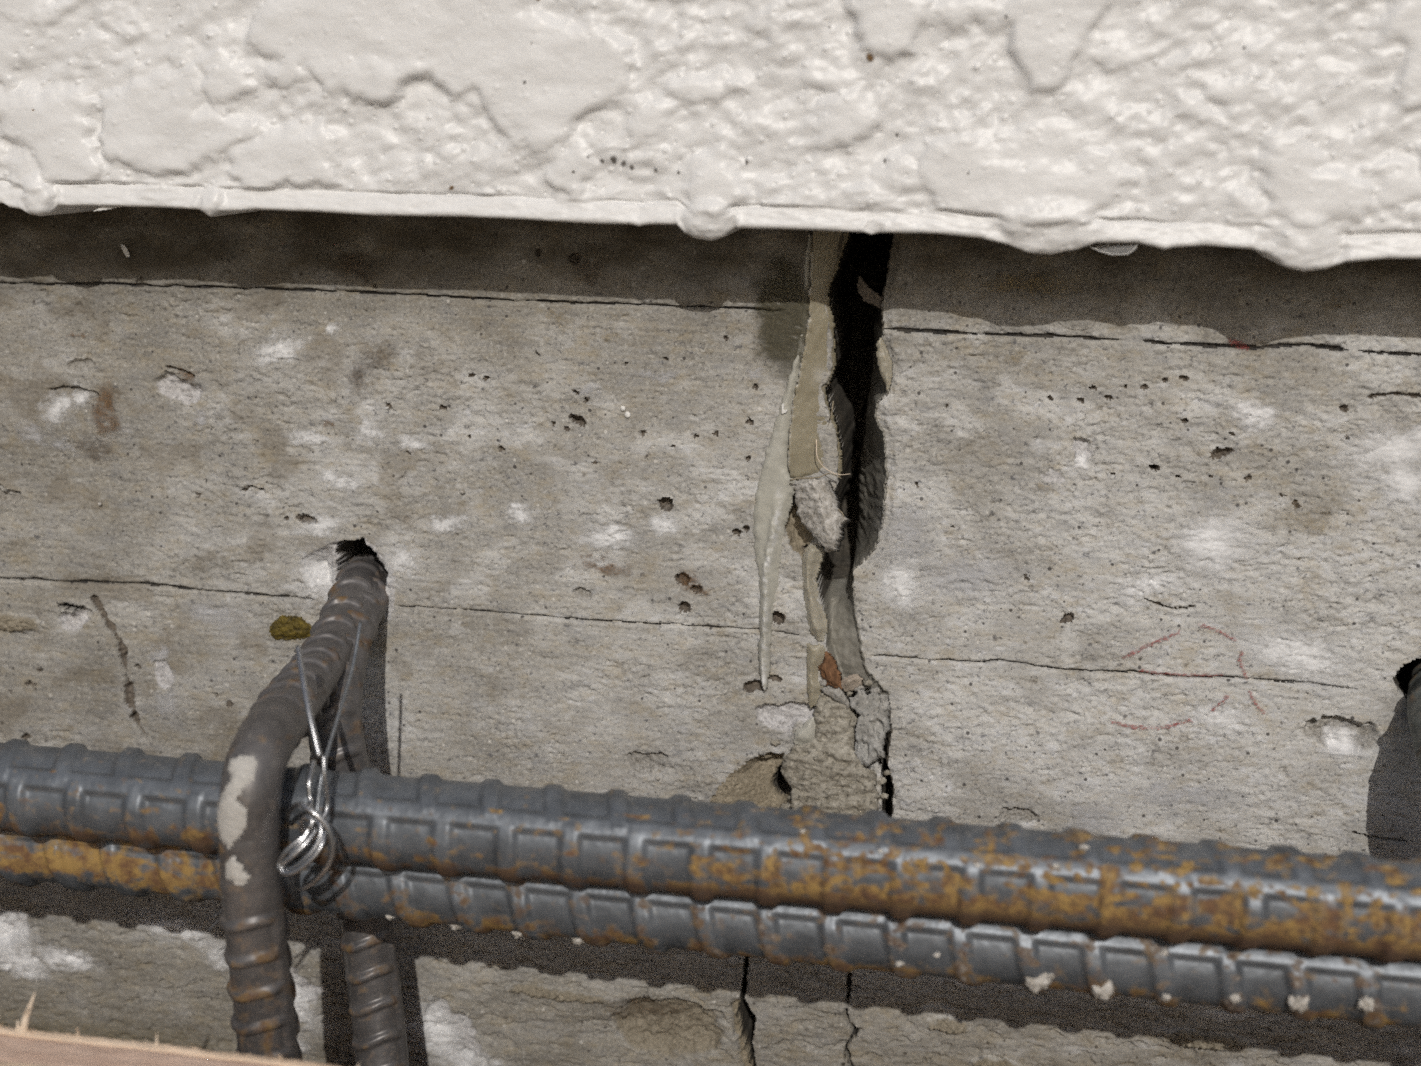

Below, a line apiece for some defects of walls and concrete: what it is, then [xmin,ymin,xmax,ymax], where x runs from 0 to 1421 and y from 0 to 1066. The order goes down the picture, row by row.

spalling [152,370,207,407]
spalling [52,601,95,634]
crack [91,593,145,733]
spalling [152,658,177,691]
spalling [300,538,351,602]
spalling [365,538,395,619]
crack [785,232,895,817]
spalling [0,739,225,902]
spalling [280,674,1421,1031]
spalling [606,991,733,1066]
crack [732,957,757,1066]
crack [789,972,859,1066]